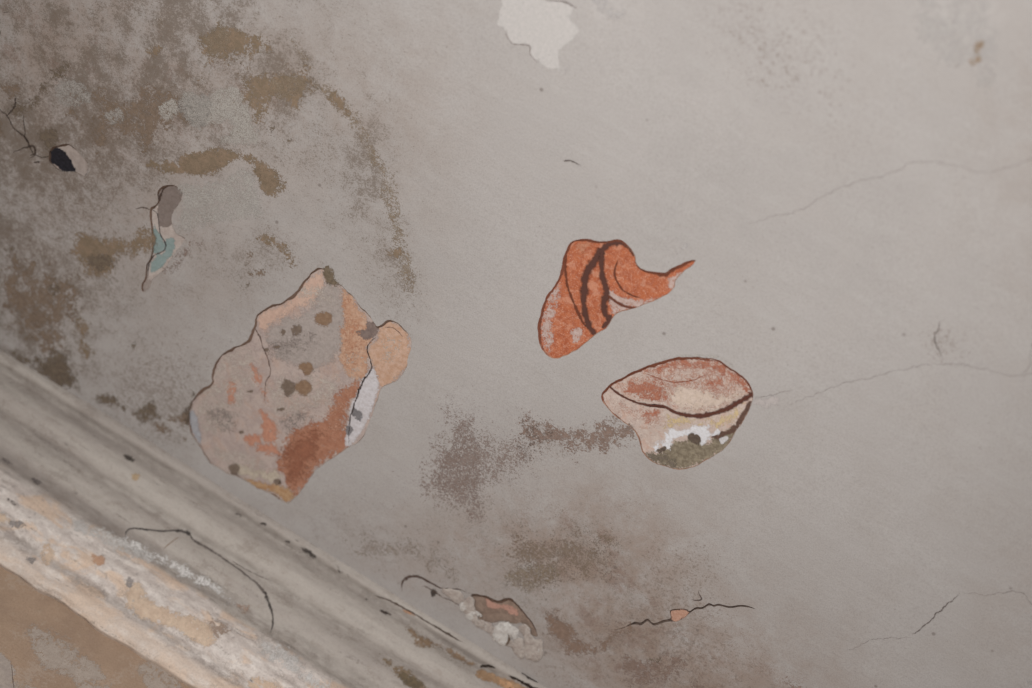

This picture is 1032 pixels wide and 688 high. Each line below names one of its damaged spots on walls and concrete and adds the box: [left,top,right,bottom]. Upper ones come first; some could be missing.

crack [0,98,49,163]
leakage [65,79,287,198]
leakage [197,16,420,304]
leakage [0,223,158,392]
spalling [537,239,696,359]
spalling [182,266,412,503]
spalling [601,354,753,470]
leakage [337,386,637,586]
crack [125,528,274,630]
flaking render [401,575,544,662]
crack [616,590,755,630]
crack [915,593,960,634]